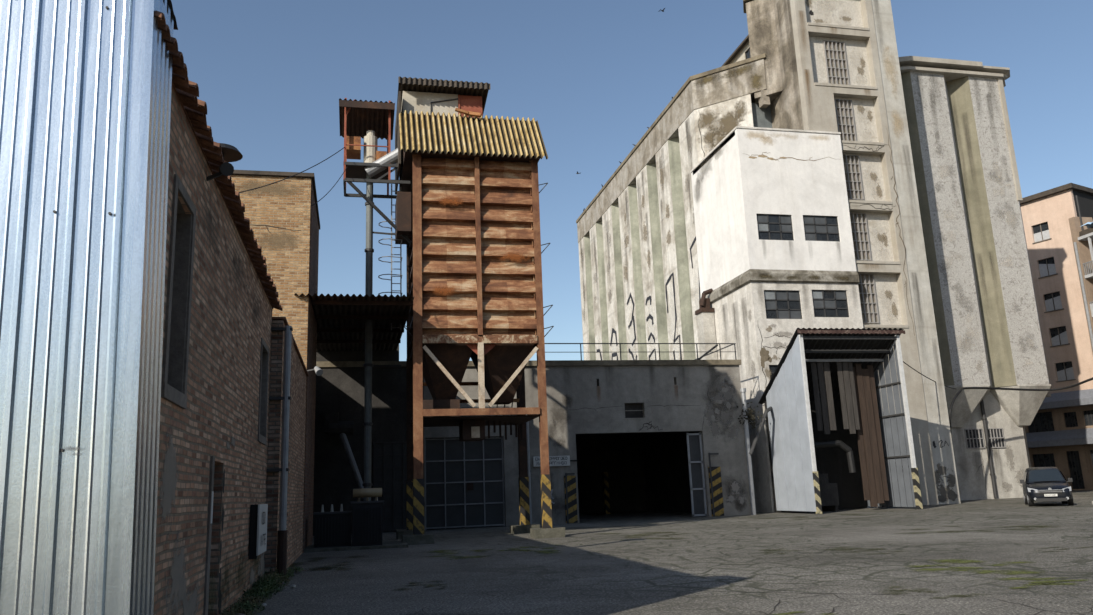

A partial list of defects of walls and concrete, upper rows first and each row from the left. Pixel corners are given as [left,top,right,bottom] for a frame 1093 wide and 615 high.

leakage [699,102,744,148]
crack [743,131,915,336]
spalling [935,463,958,502]